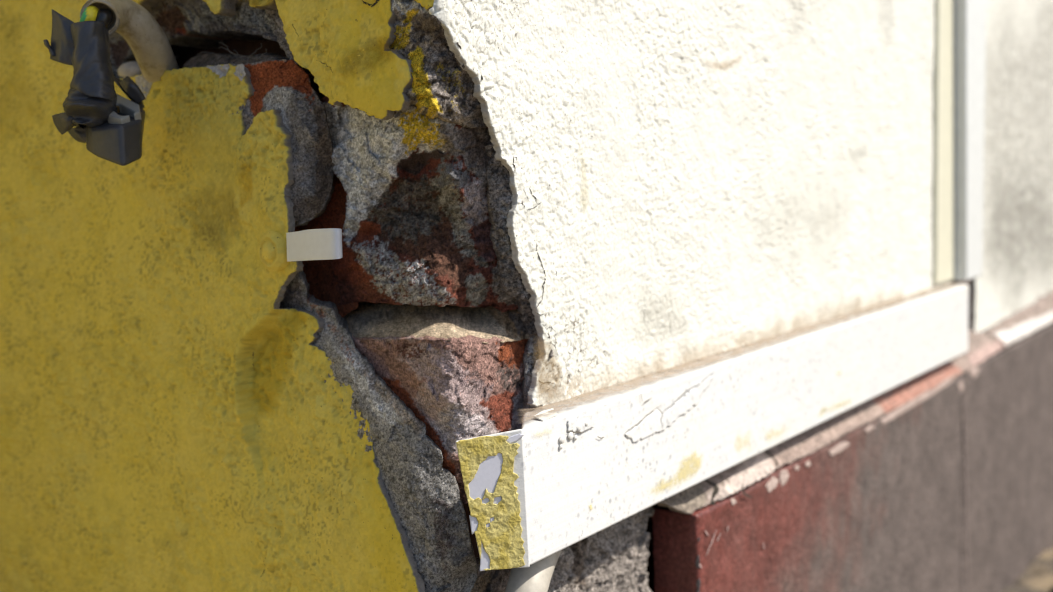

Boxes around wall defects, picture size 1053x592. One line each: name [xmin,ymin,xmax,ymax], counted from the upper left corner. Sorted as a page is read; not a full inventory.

spalling [109,31,137,78]
flaking render [390,0,487,128]
flaking render [149,0,335,227]
flaking render [484,143,558,421]
flaking render [279,270,524,592]
peeling [625,371,716,442]
spalling [765,460,811,492]
spalling [828,441,850,457]
spalling [865,366,981,433]